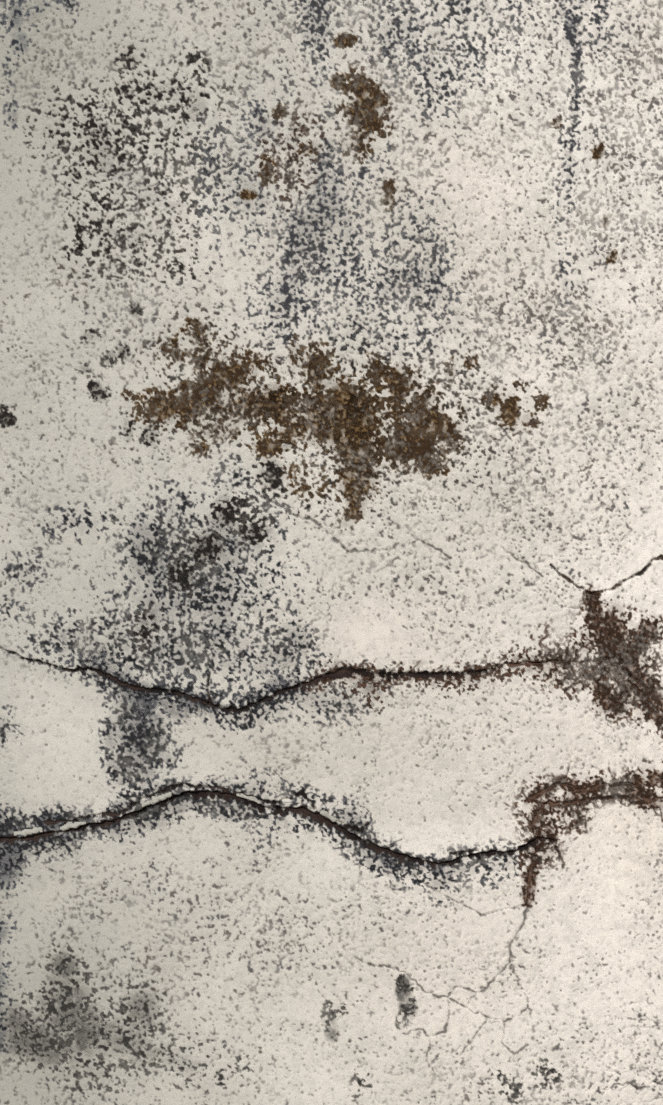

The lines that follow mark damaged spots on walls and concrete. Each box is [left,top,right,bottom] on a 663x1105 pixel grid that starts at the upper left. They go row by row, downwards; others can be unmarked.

corrosion [240,102,324,201]
crack [0,554,663,1055]